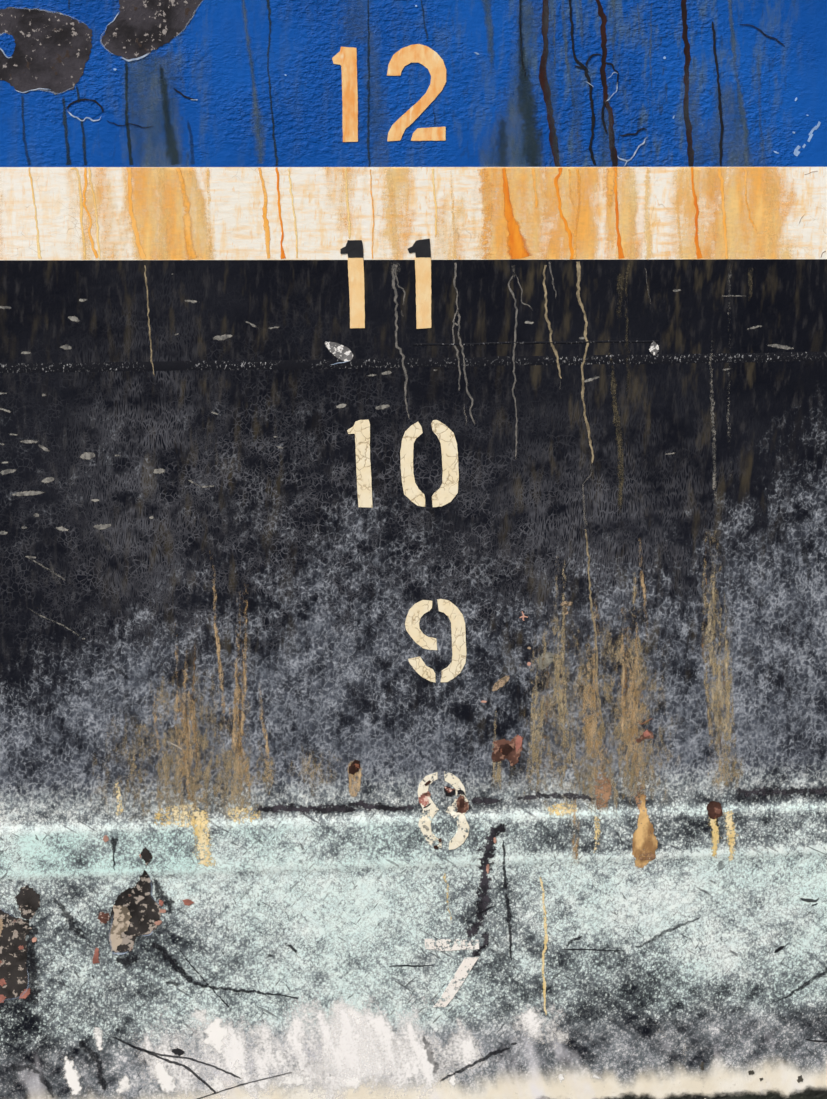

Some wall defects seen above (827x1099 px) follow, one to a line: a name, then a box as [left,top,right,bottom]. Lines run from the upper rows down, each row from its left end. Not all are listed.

peeling [0,0,202,95]
corrosion [22,97,42,259]
corrosion [62,98,114,259]
corrosion [126,167,212,260]
corrosion [479,167,651,509]
corrosion [115,624,273,867]
corrosion [491,597,662,868]
corrosion [702,561,742,786]
peeling [0,885,42,1003]
peeling [92,847,194,968]
corrosion [706,801,738,862]